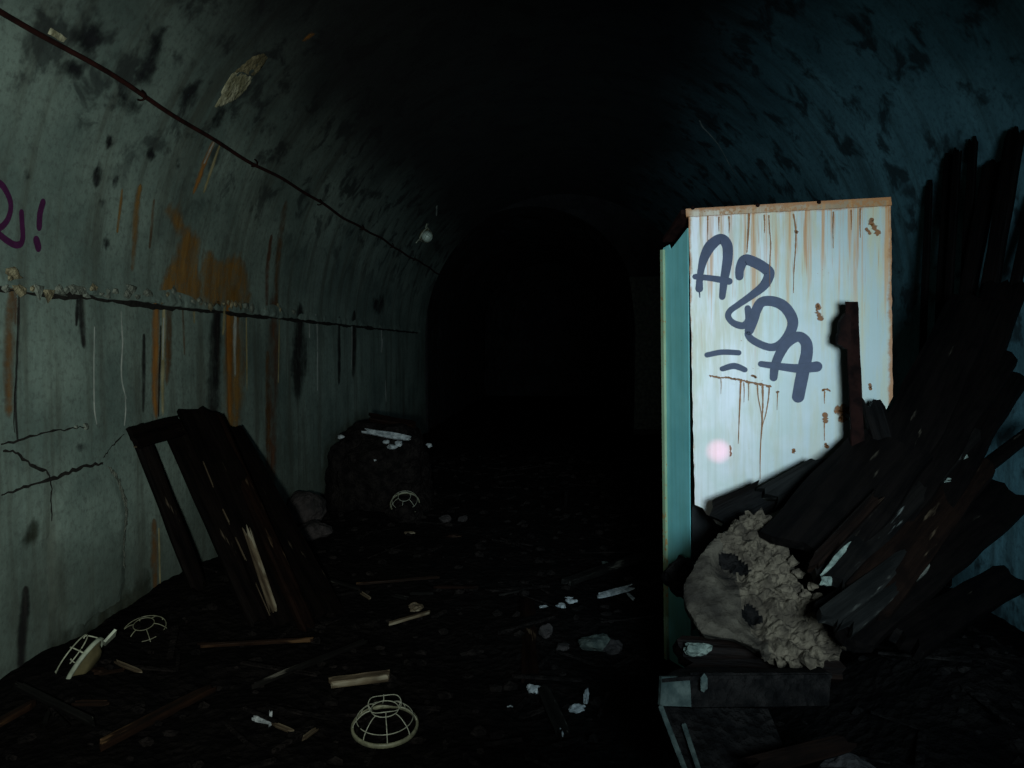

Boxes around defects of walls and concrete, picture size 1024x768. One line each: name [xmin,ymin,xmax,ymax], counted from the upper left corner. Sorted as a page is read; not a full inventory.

water stain [136,28,165,81]
spalling [215,53,267,108]
crack [1,307,124,521]
rust [152,303,195,417]
rust [222,290,248,427]